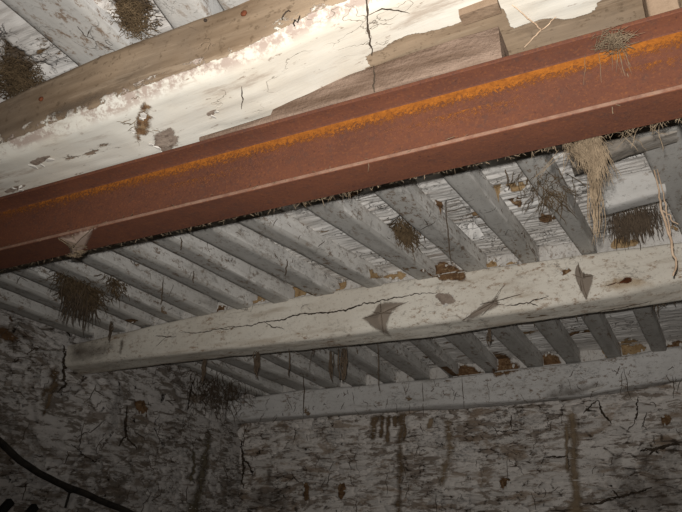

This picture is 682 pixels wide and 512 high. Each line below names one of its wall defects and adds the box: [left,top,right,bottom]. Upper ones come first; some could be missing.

crack [366,0,408,92]
flaking render [131,103,179,152]
corrosion [0,31,682,221]
flaking render [28,156,55,169]
flaking render [420,262,466,281]
crack [158,292,437,345]
crack [57,344,67,395]
crack [583,400,611,423]
crack [240,441,253,488]
damp [370,413,407,512]
damp [565,412,584,512]
crack [640,443,680,455]